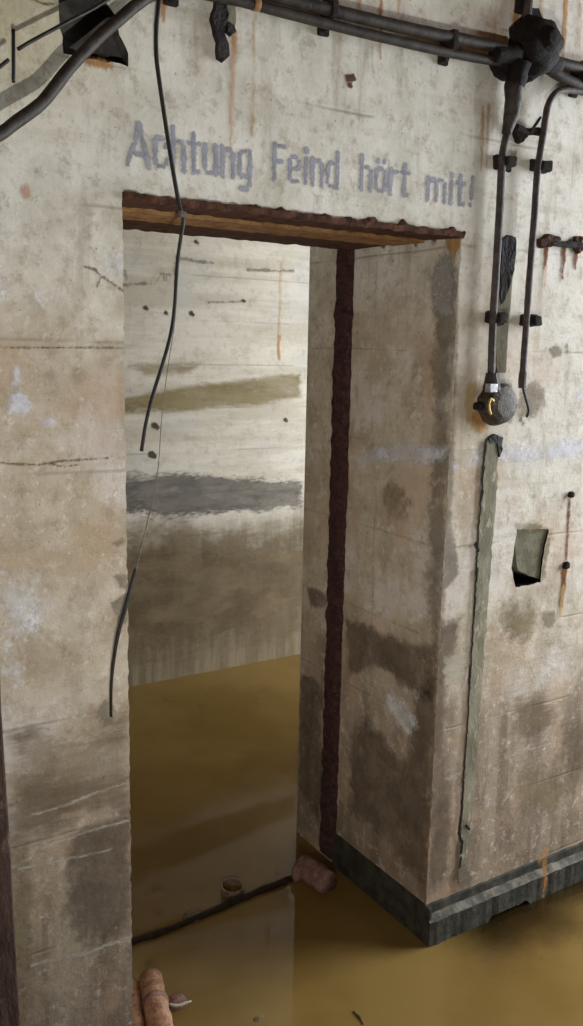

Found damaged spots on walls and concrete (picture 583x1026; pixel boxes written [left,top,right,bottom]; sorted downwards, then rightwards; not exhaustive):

corrosion [561,248,578,279]
damp [125,376,299,412]
damp [432,274,458,398]
damp [126,473,303,519]
corrosion [559,498,571,617]
damp [346,408,468,885]
crack [458,439,487,883]
damp [10,773,129,830]
damp [15,820,130,968]